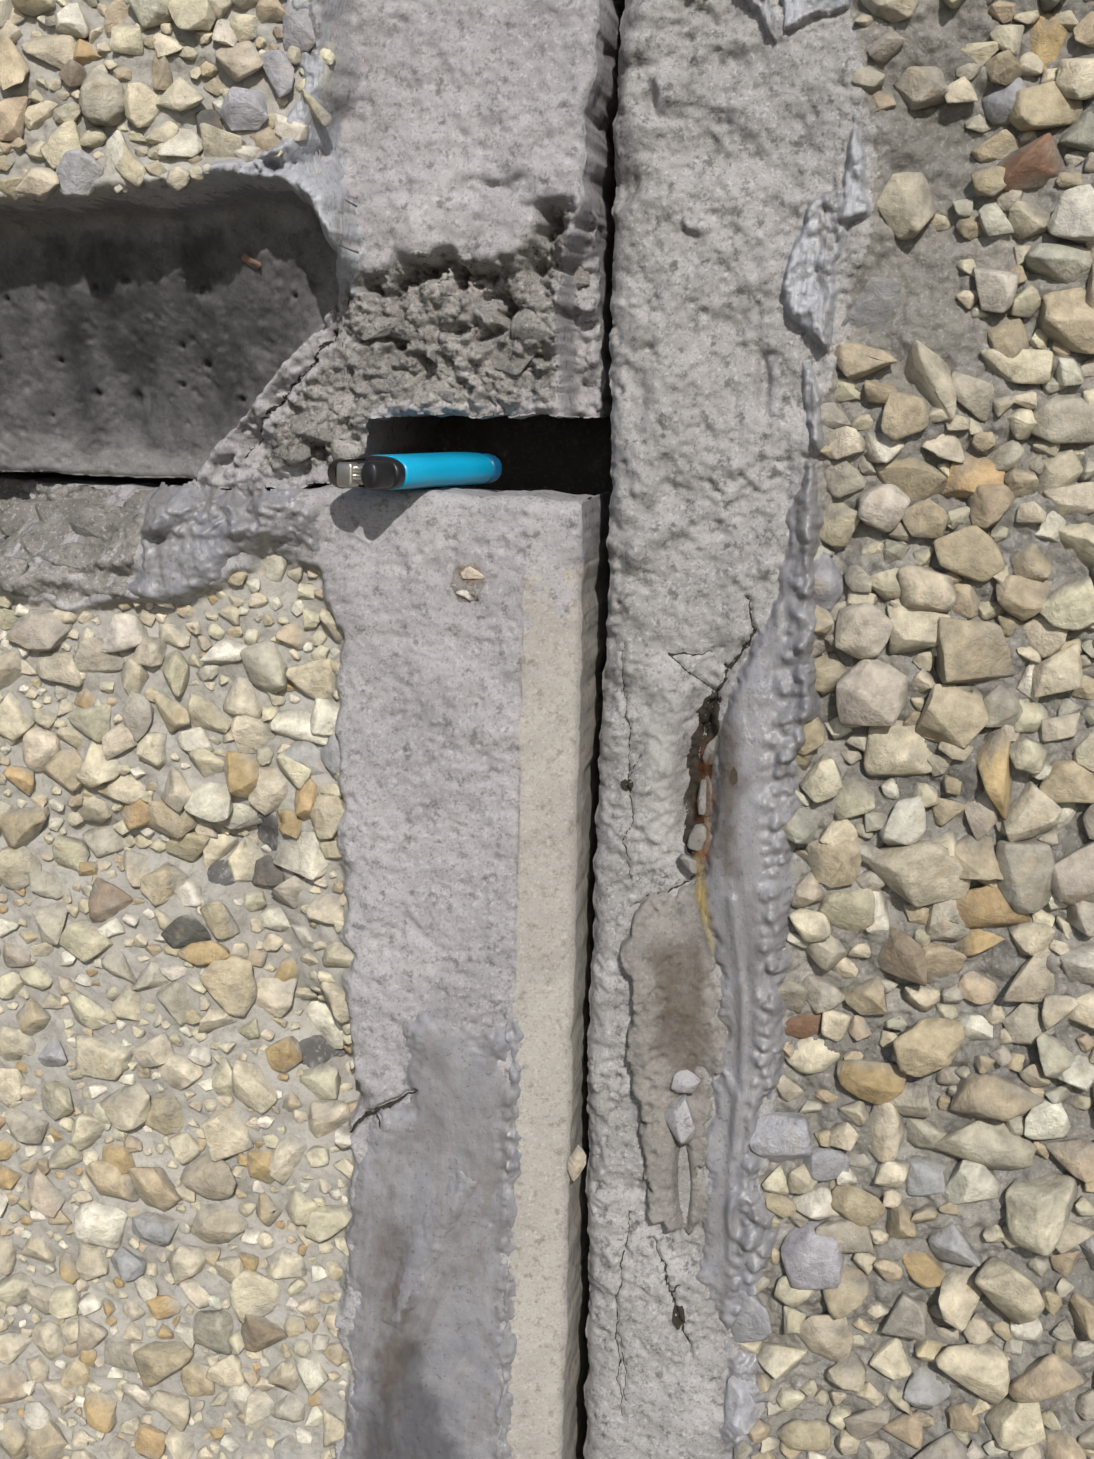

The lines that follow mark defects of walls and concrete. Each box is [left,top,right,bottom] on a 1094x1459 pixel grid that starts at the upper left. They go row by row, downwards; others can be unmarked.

spalling [253,209,590,473]
crack [668,597,757,732]
crack [622,643,698,907]
rust [697,760,711,922]
crack [615,1211,692,1416]